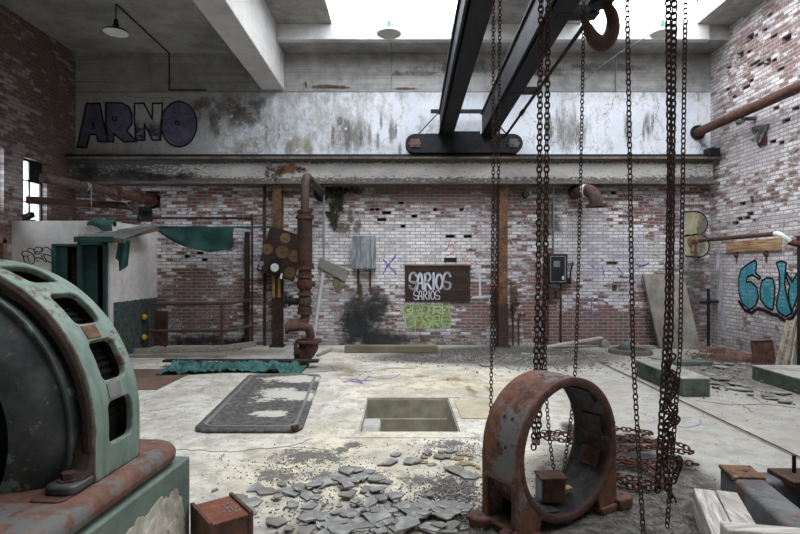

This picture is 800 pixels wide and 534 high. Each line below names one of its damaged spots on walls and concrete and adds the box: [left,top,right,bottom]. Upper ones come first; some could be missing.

water stain [190,98,276,153]
water stain [332,116,397,152]
water stain [546,113,584,146]
rust [264,163,306,180]